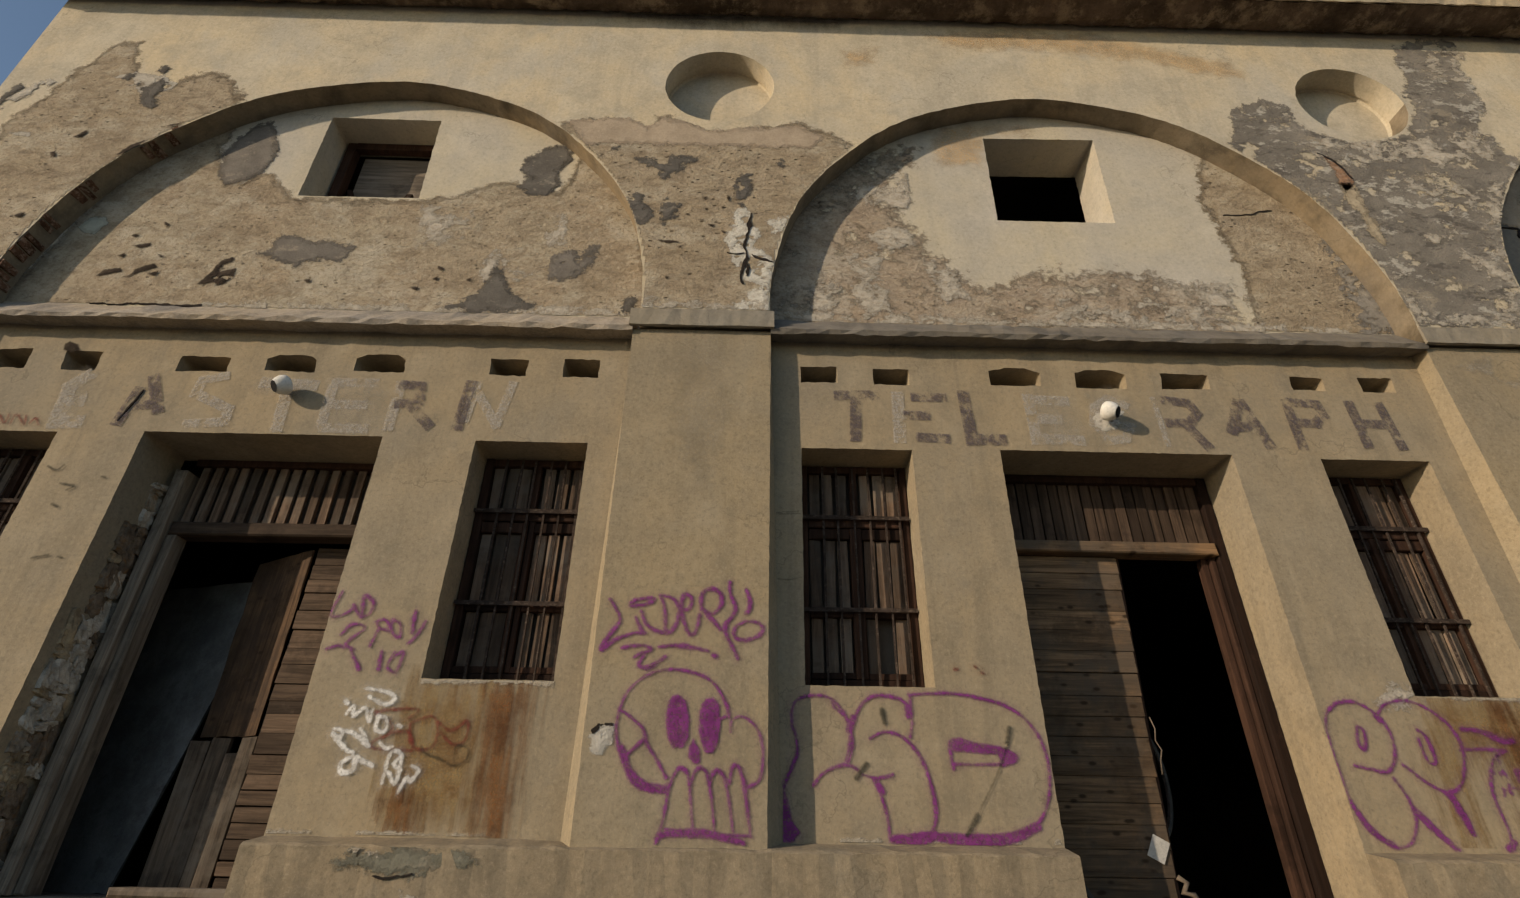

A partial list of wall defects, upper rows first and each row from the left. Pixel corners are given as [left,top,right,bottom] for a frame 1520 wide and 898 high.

flaking render [0,40,1395,335]
crack [727,213,774,284]
peeling [1228,38,1520,329]
flaking render [0,482,169,871]
peeling [330,830,488,883]
corrosion [390,683,529,838]